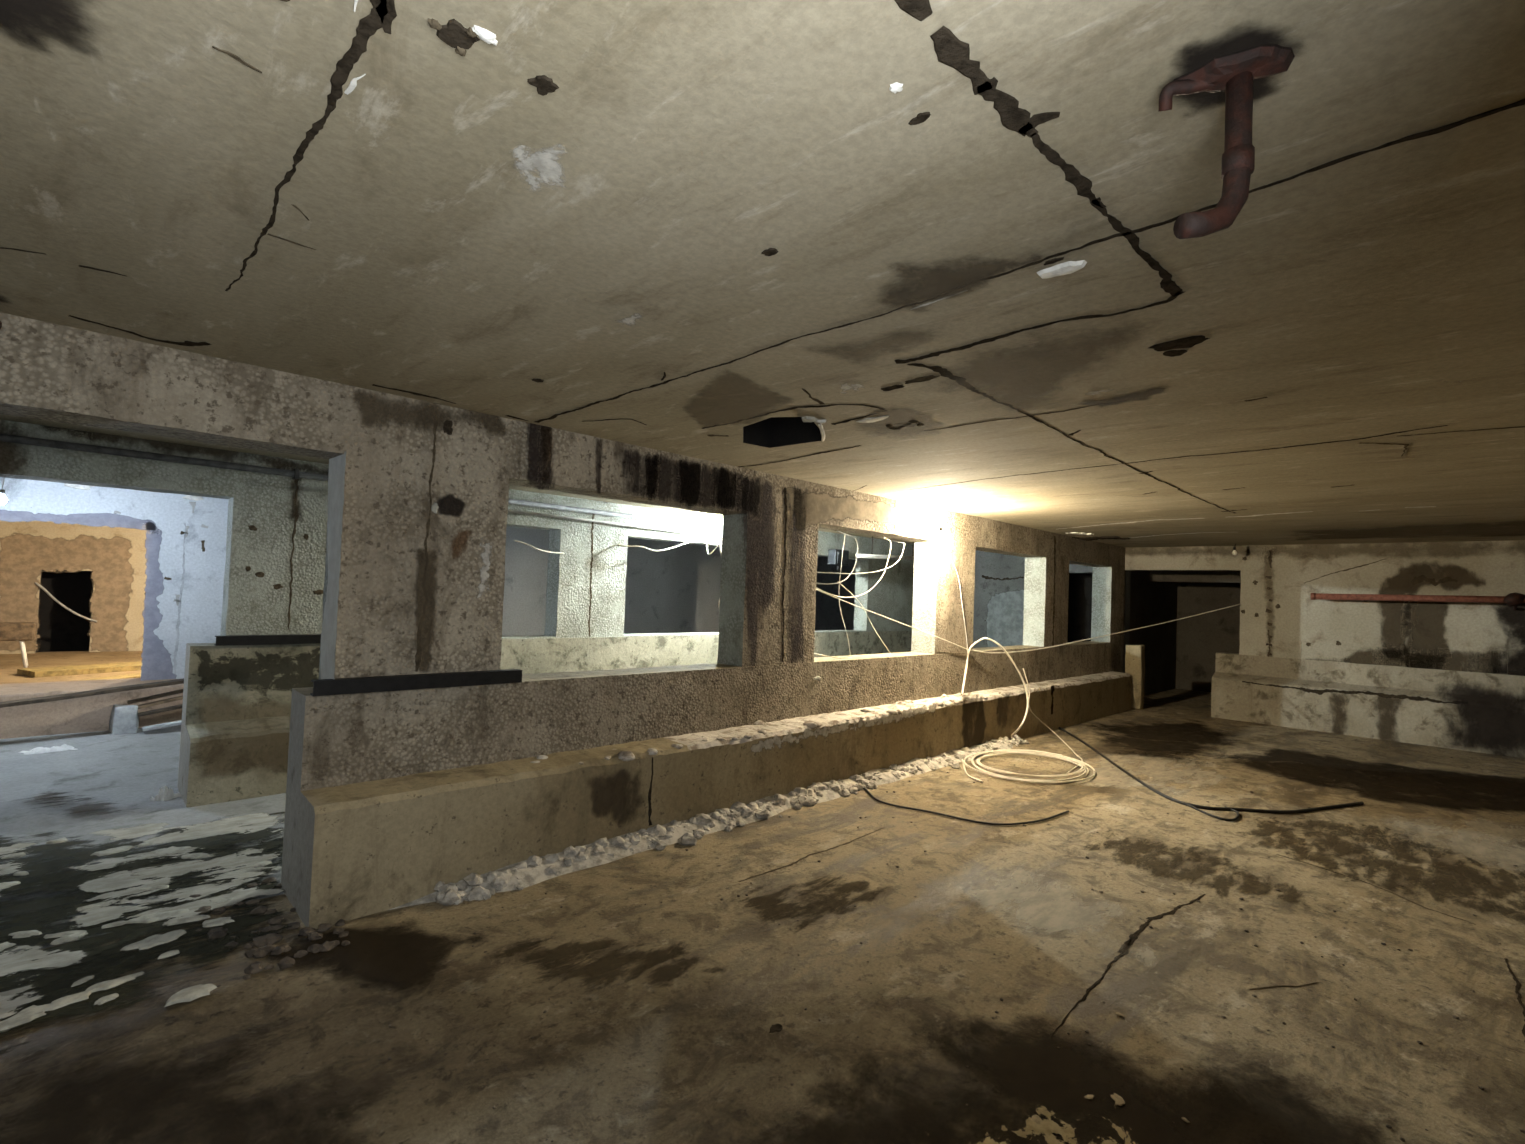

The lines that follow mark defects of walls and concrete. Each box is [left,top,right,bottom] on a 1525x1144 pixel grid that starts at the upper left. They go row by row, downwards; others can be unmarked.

damp [0,0,87,49]
crack [212,46,262,73]
crack [225,0,397,291]
crack [854,0,1525,530]
crack [506,298,946,425]
crack [64,483,121,514]
crack [144,495,209,673]
crack [587,514,595,636]
crack [702,388,885,662]
damp [1062,518,1525,759]
damp [1075,720,1525,924]
crack [1054,894,1205,1033]